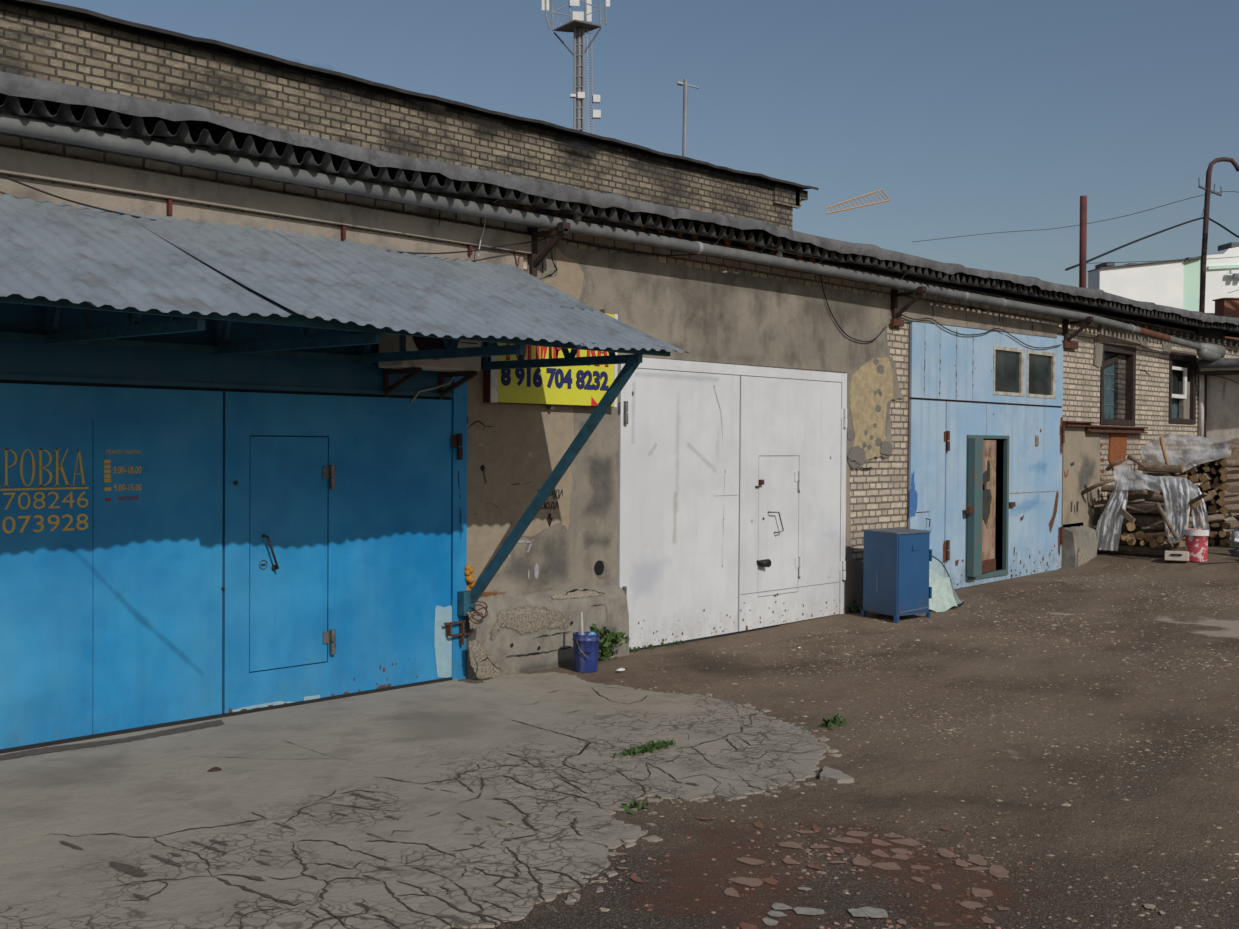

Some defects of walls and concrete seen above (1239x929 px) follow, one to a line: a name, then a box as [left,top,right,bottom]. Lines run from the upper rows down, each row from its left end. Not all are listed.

flaking render [847,357,893,469]
rust [1010,491,1060,578]
crack [474,589,608,678]
crack [47,686,816,929]